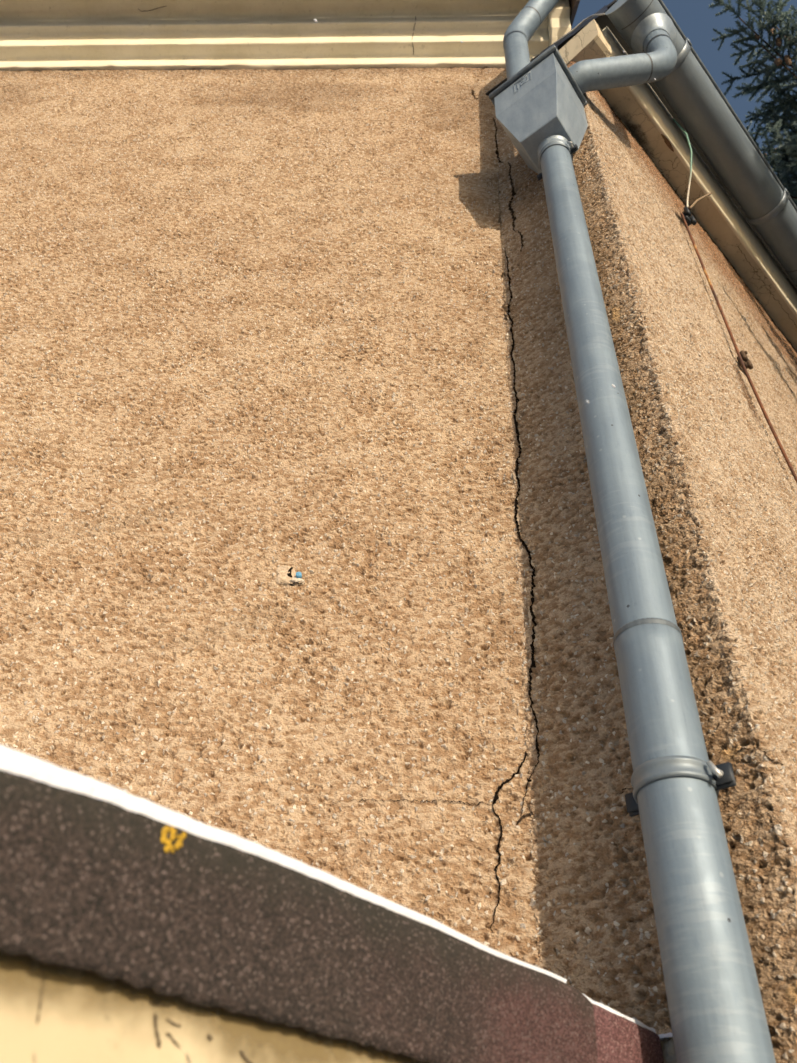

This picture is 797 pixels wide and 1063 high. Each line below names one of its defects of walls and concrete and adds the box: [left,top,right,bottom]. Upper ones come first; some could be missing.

crack [328,90,540,933]